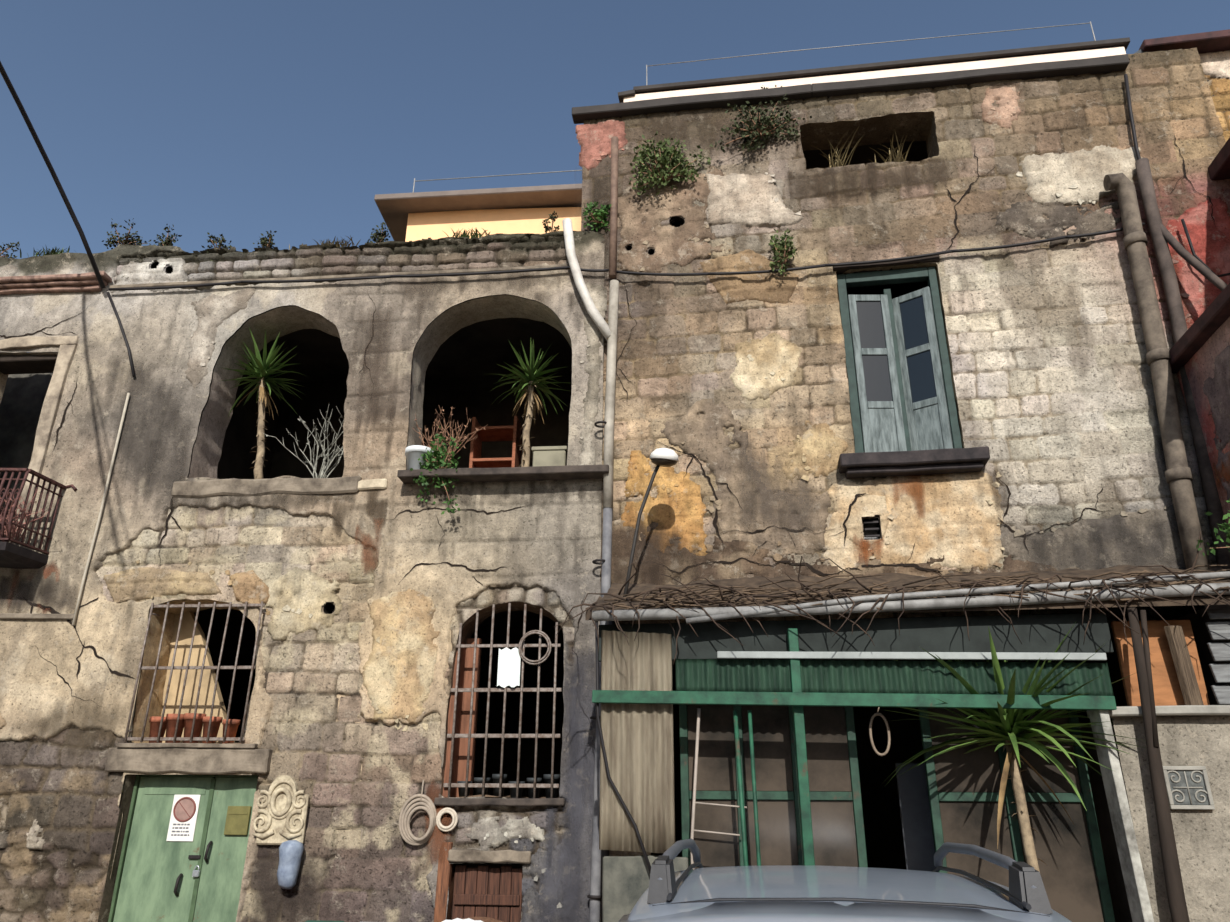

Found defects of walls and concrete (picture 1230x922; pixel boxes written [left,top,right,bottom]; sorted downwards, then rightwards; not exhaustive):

peeling [617,165,804,278]
peeling [991,145,1143,251]
crack [0,302,95,338]
crack [52,382,77,452]
peeling [1203,345,1230,500]
crack [159,496,182,557]
crack [384,504,535,589]
water stain [614,522,695,585]
crack [658,441,978,576]
crack [26,597,135,708]
peeling [96,505,575,922]
peeling [0,725,132,922]